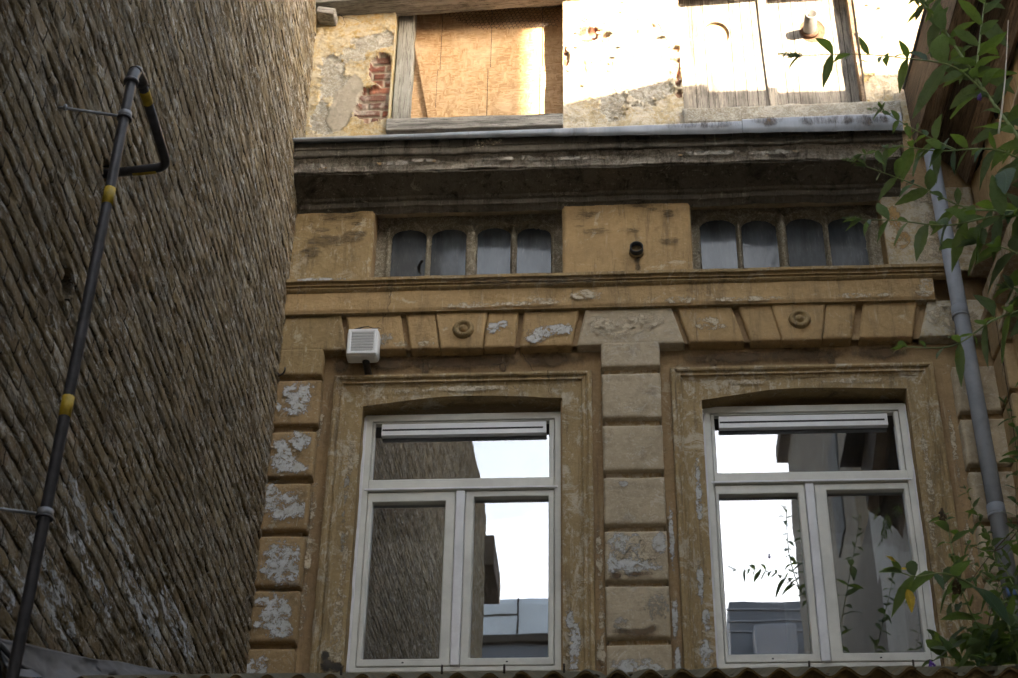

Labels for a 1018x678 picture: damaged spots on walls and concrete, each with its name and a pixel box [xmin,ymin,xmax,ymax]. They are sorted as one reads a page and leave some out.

peeling [309,29,394,136]
spalling [562,24,683,122]
peeling [525,323,572,343]
peeling [275,382,314,416]
peeling [253,410,324,638]
peeling [596,508,681,673]
peeling [565,611,581,671]